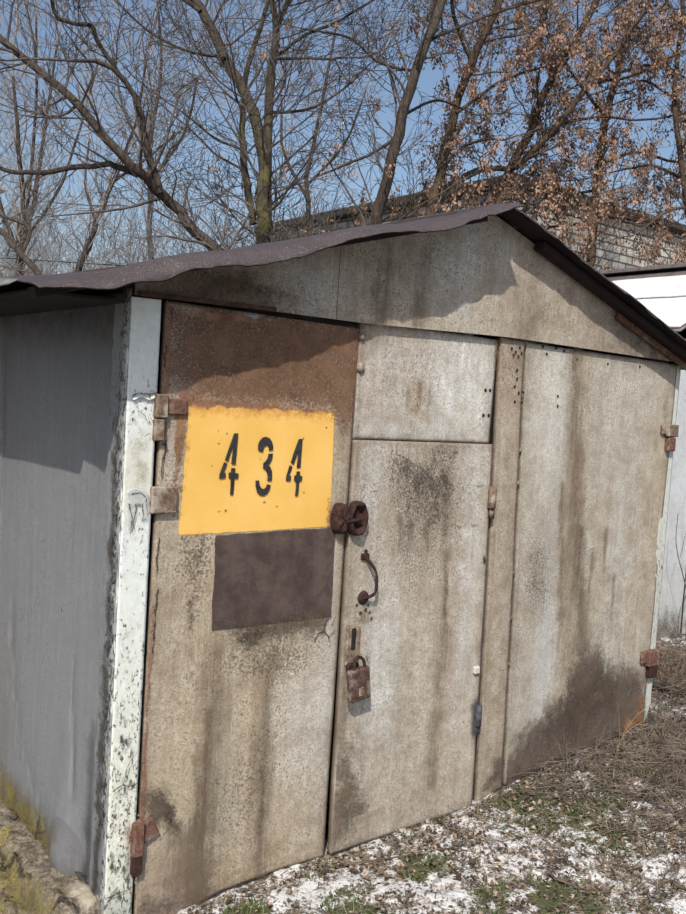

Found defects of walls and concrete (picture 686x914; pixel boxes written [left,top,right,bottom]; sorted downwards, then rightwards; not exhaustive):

rust [162,304,364,489]
water stain [390,443,468,538]
crack [314,616,336,642]